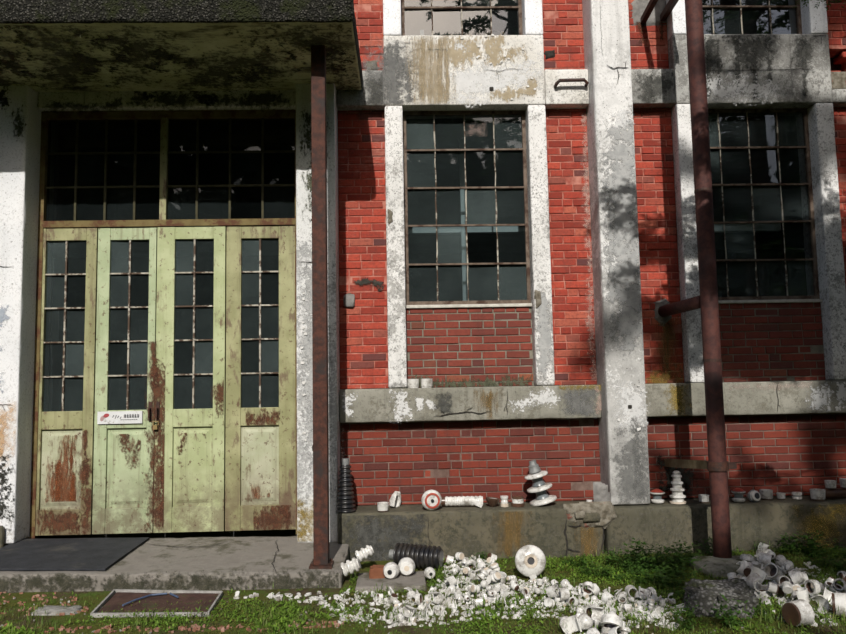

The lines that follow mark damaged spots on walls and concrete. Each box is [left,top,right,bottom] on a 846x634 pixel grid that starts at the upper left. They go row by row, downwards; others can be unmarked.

damp [0,24,359,93]
damp [384,35,456,104]
damp [704,35,777,99]
damp [792,35,818,96]
damp [0,408,14,531]
rust [37,430,92,535]
rust [144,341,165,532]
rust [246,408,283,425]